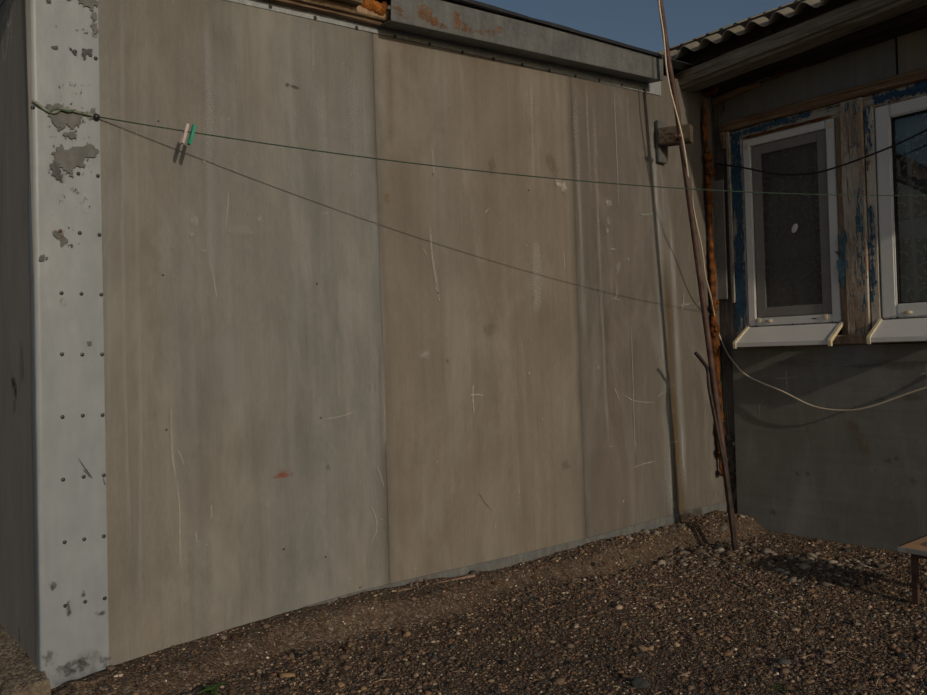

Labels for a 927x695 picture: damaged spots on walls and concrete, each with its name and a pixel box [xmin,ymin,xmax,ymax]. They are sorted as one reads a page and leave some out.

peeling [69,0,100,37]
peeling [45,84,99,182]
peeling [843,80,927,174]
peeling [729,106,833,332]
peeling [835,185,877,311]